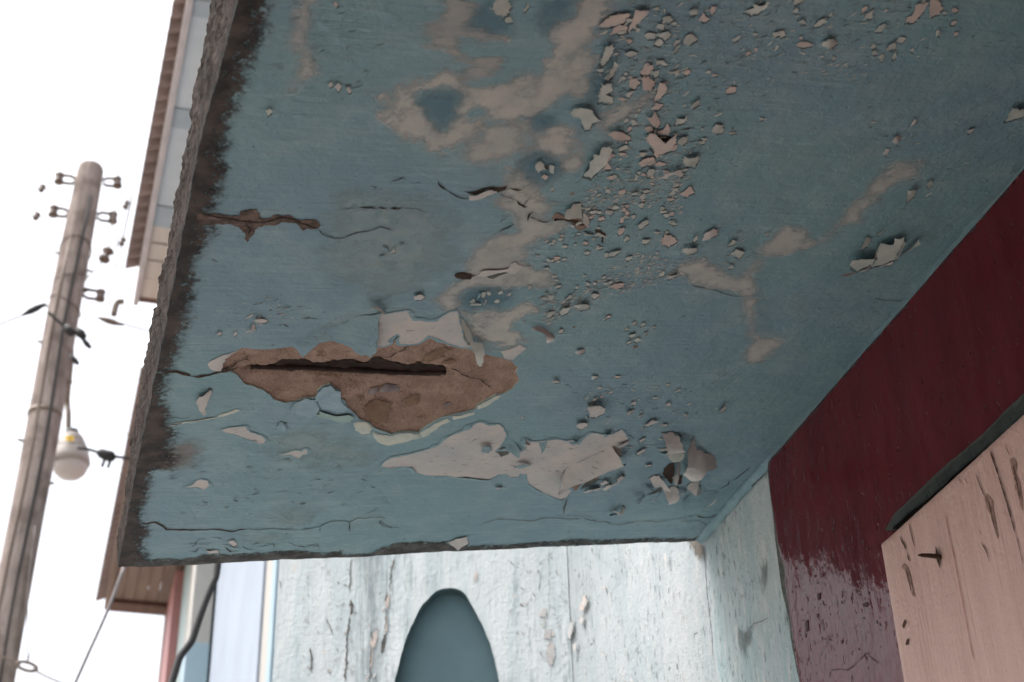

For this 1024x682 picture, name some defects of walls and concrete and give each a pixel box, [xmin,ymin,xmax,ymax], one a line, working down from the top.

peeling [999,108,1024,124]
peeling [523,0,959,343]
crack [197,178,606,243]
crack [454,262,525,280]
spalling [208,290,738,516]